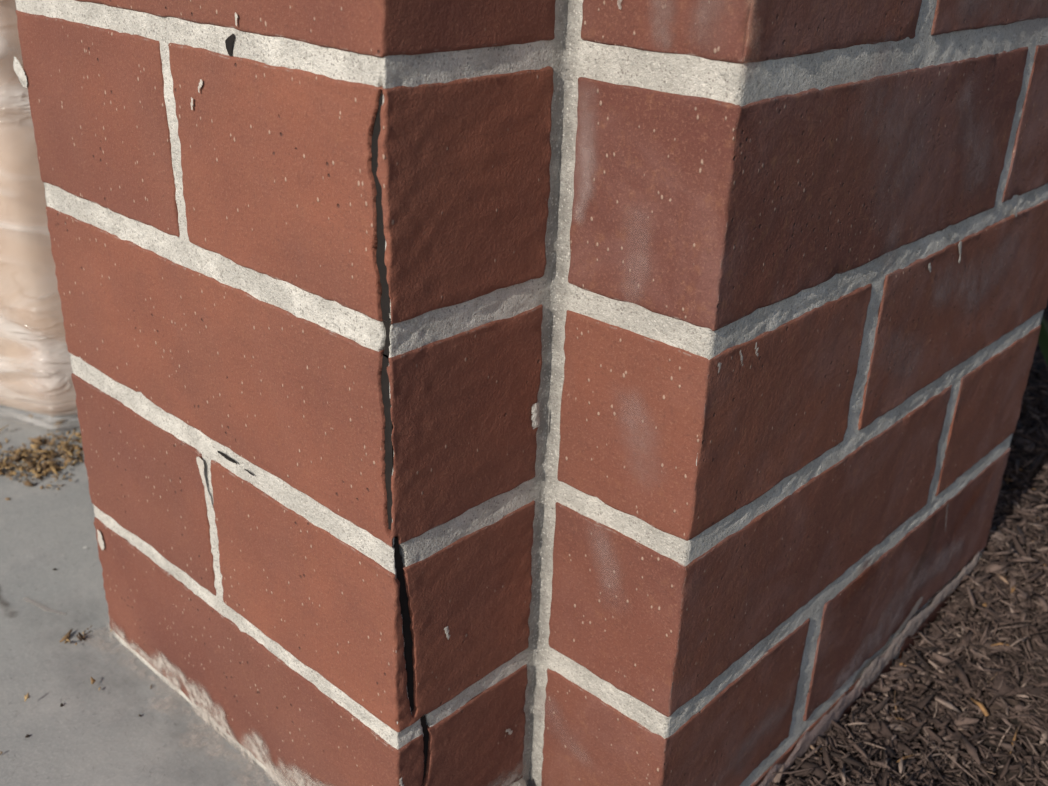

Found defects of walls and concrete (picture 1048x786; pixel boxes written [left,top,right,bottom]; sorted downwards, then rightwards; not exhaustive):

leakage [110,630,317,786]
crack [371,90,429,783]